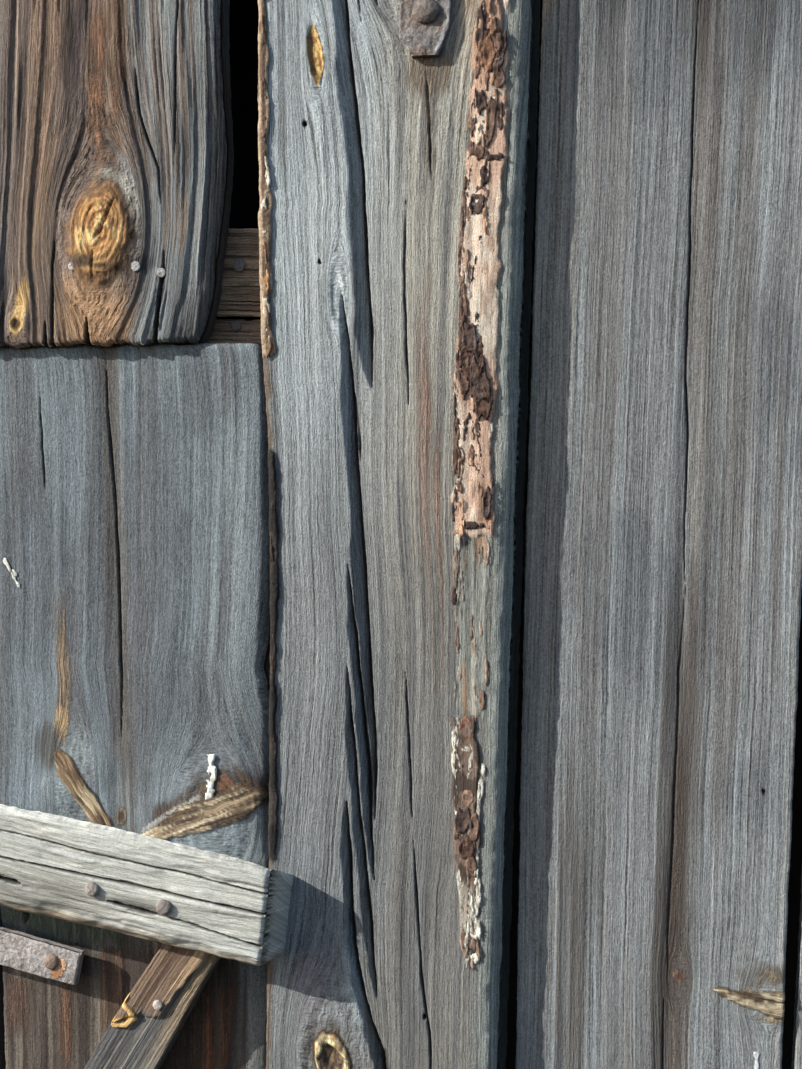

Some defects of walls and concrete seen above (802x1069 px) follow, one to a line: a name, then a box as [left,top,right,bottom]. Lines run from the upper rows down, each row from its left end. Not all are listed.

crack [343,0,387,1069]
peeling [451,0,510,970]